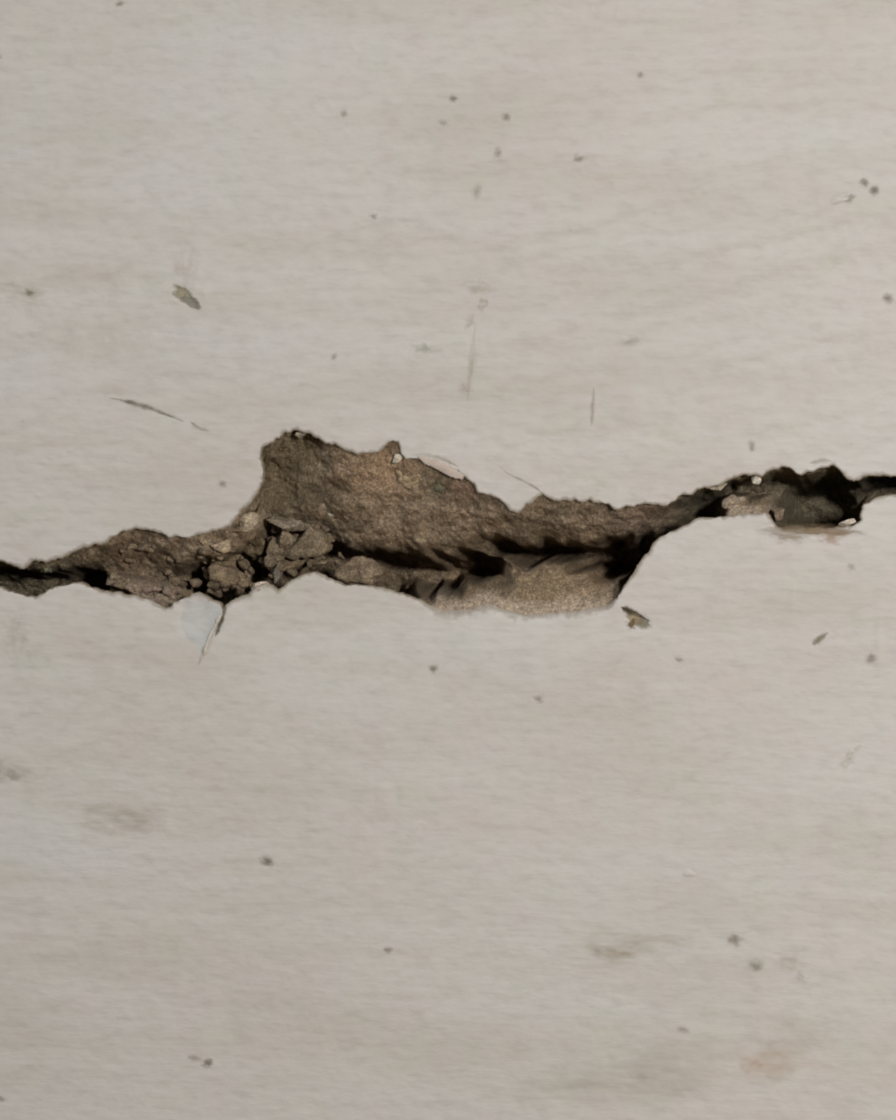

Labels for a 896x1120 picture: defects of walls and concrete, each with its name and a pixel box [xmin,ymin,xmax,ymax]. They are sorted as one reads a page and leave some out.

crack [0,528,224,657]
flaking render [184,429,676,628]
crack [669,464,896,532]